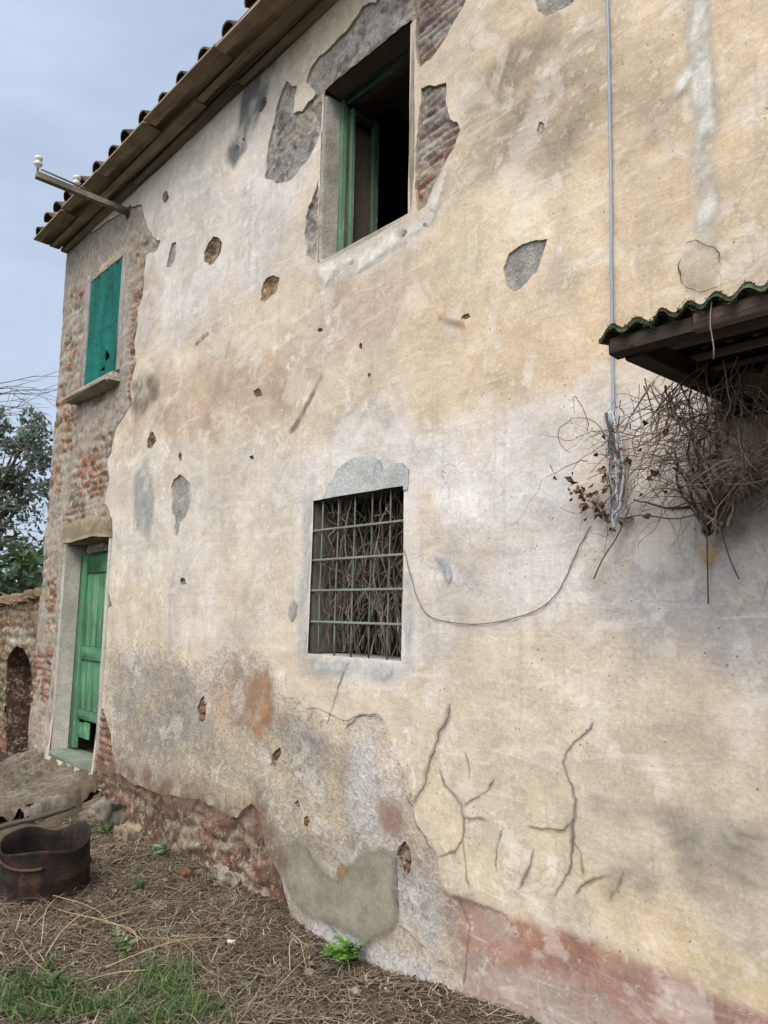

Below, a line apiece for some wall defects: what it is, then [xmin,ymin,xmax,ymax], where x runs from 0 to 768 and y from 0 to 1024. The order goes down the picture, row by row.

flaking render [259,0,466,184]
flaking render [414,83,460,213]
water stain [674,0,719,233]
spalling [204,236,222,265]
spalling [261,275,280,302]
flaking render [503,239,547,291]
flaking render [171,474,191,537]
flaking render [87,635,463,994]
crack [406,703,624,979]